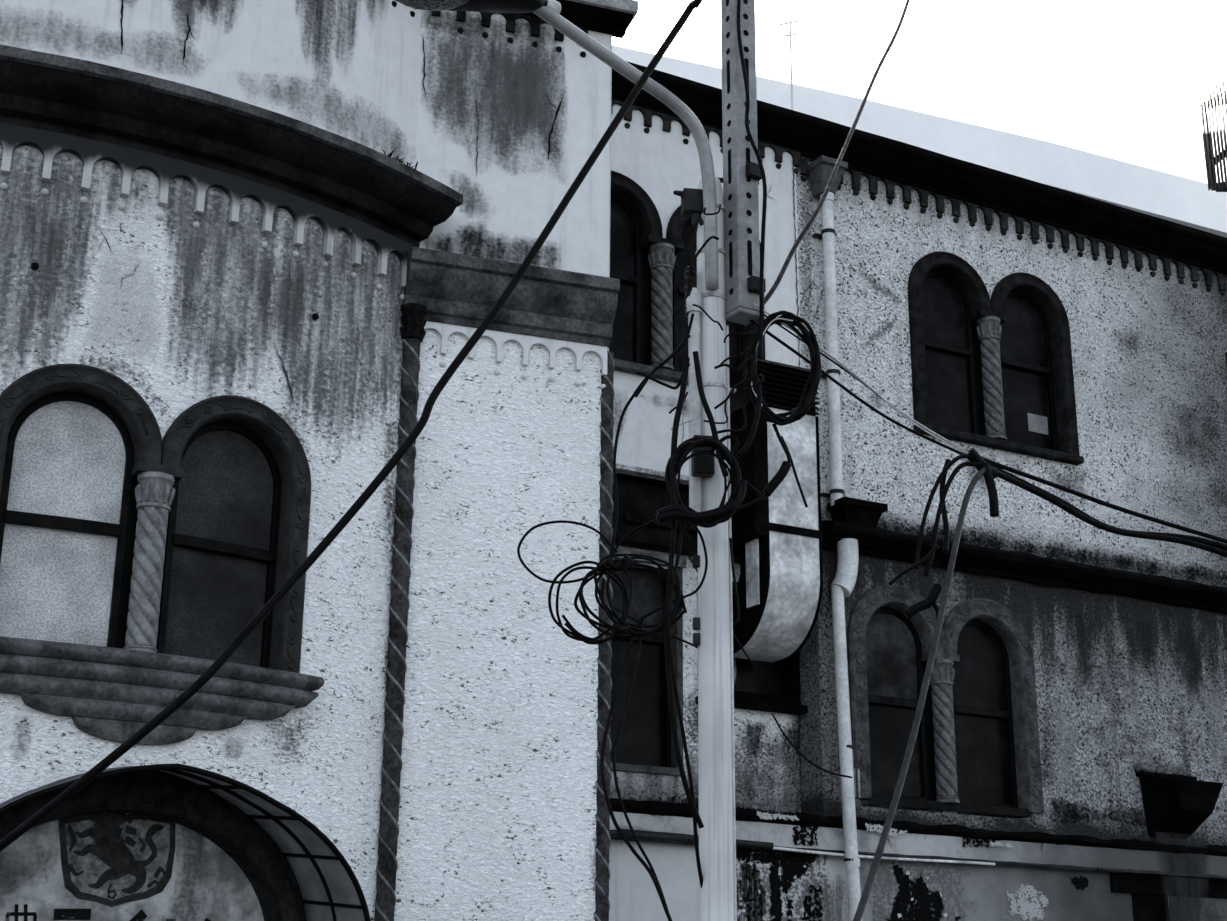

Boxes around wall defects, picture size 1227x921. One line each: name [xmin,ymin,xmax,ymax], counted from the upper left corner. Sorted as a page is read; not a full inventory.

crack [118,0,126,53]
crack [183,13,195,65]
water stain [174,0,236,32]
water stain [297,0,384,73]
water stain [425,11,565,173]
water stain [428,178,556,269]
water stain [0,150,403,586]
peeling [736,811,831,921]
spalling [865,823,907,837]
peeling [872,860,967,921]
peeling [963,837,1013,848]
water stain [1042,706,1208,921]